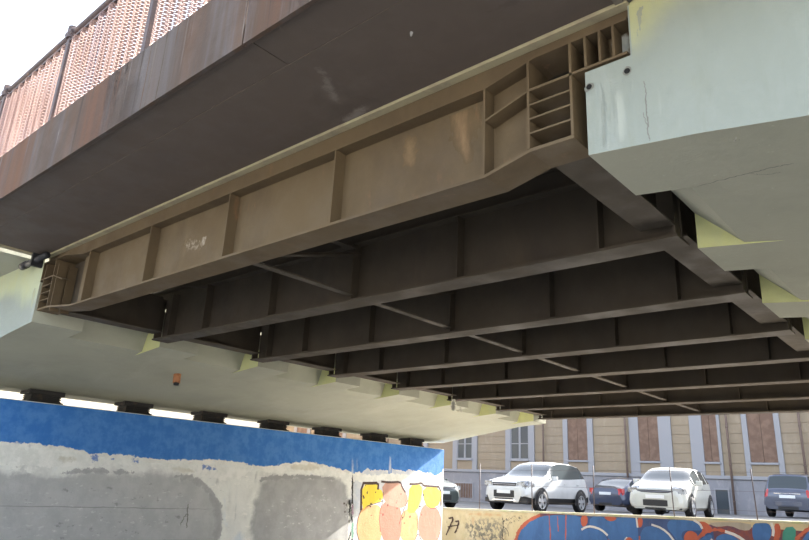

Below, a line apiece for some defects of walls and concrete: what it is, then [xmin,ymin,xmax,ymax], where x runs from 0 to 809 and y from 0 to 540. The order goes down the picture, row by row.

rust [246,0,295,40]
rust [70,66,127,154]
rust [0,127,41,198]